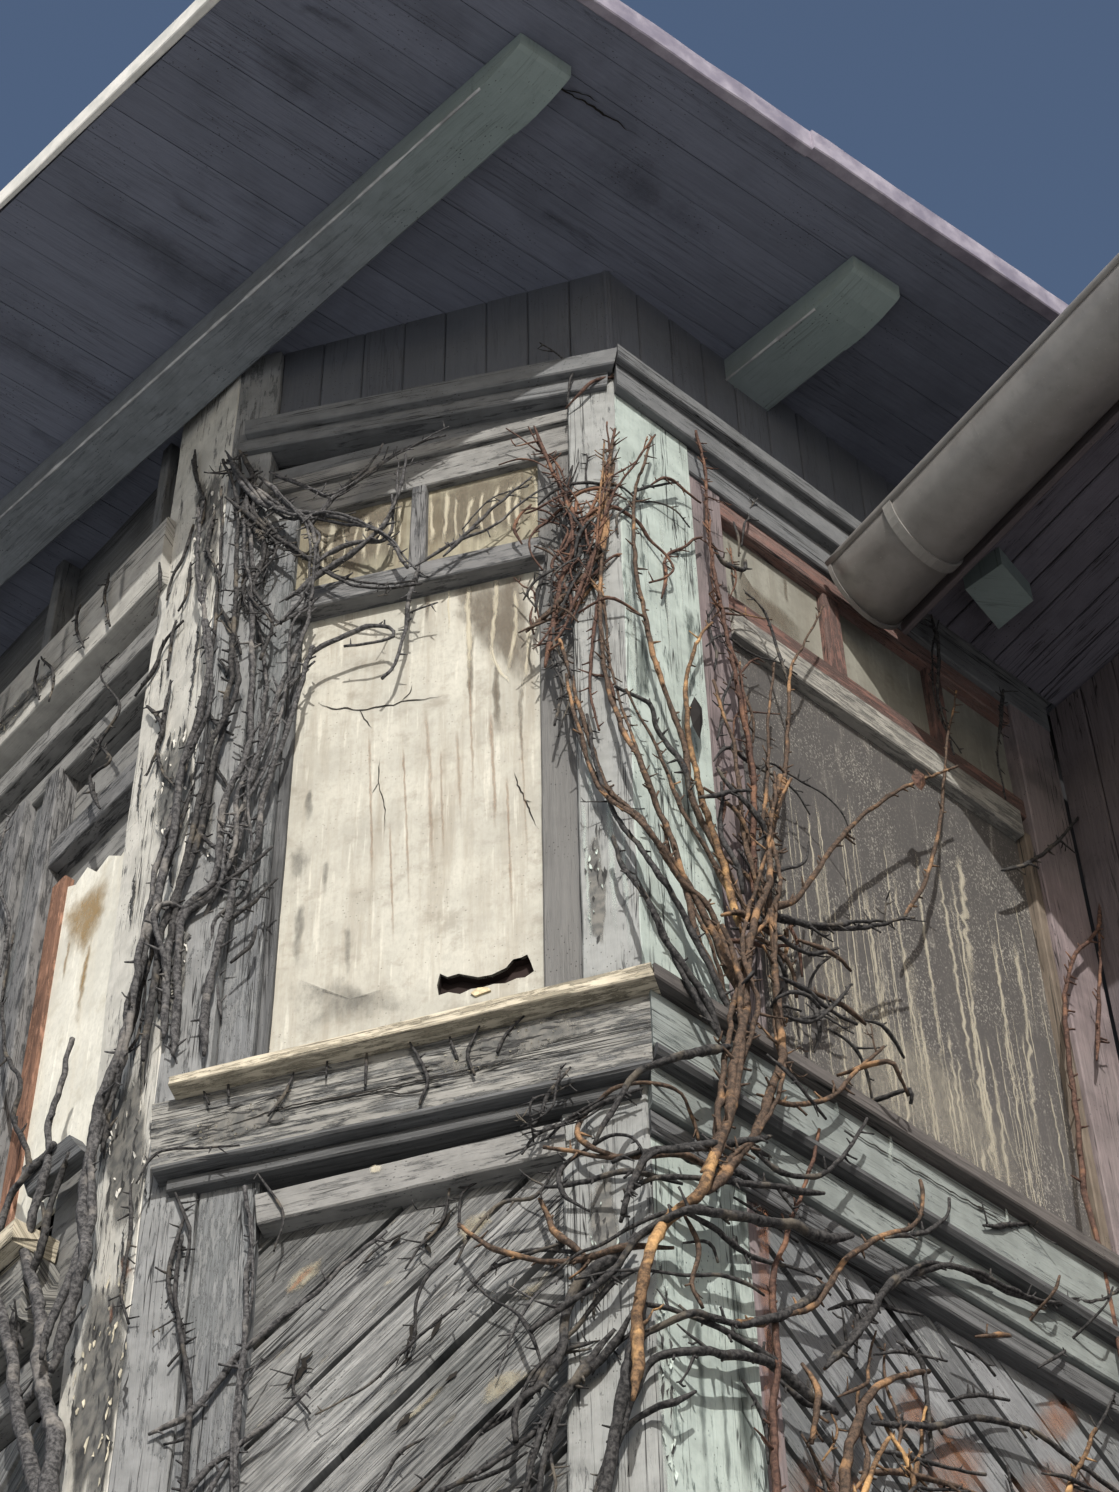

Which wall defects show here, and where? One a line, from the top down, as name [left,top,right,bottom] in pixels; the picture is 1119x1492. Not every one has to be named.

crack [561,88,632,132]
damp [311,504,401,570]
damp [430,474,538,536]
damp [447,576,530,717]
spalling [437,955,534,997]
damp [763,822,1067,1206]